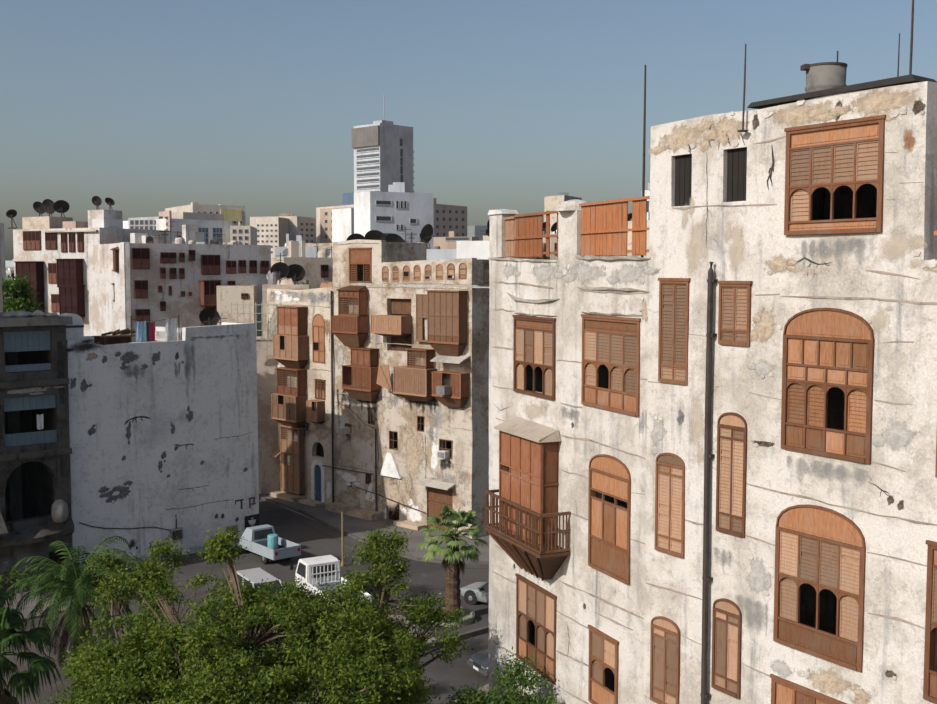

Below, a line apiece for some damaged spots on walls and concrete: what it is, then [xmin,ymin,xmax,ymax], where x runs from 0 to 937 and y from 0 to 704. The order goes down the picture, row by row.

flaking render [650,90,926,155]
flaking render [762,256,823,275]
flaking render [66,339,161,370]
flaking render [99,481,133,503]